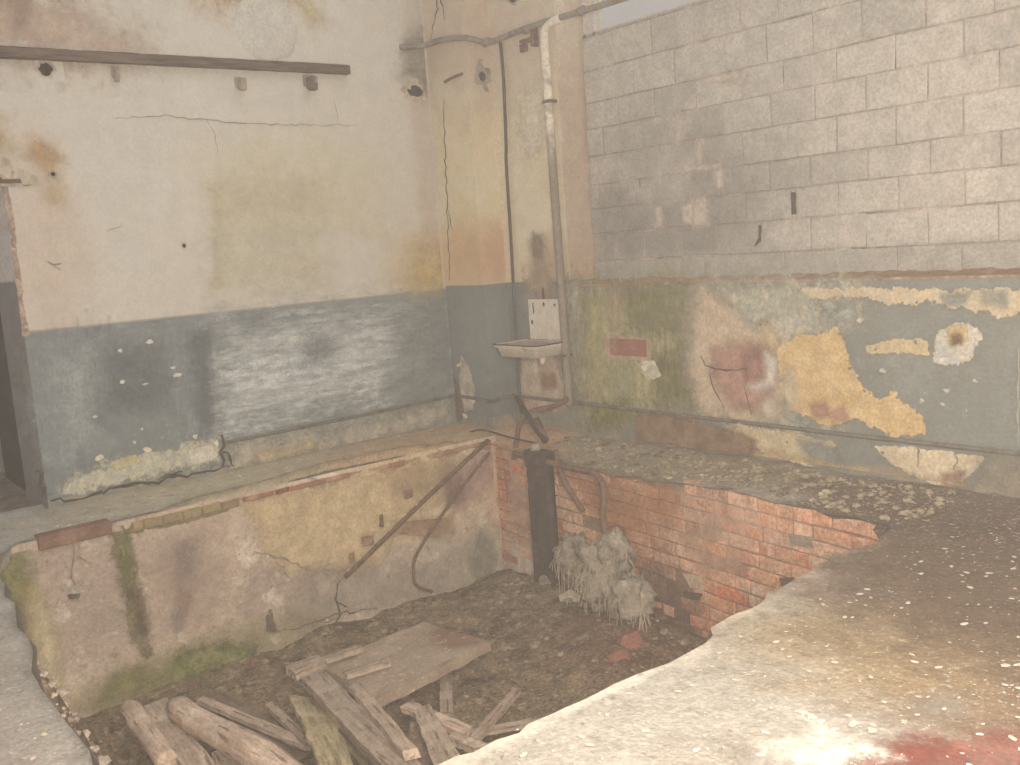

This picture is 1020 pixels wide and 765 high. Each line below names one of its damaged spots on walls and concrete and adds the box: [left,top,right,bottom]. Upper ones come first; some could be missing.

crack [430,0,445,40]
crack [114,102,353,152]
crack [443,107,452,281]
water stain [522,234,553,299]
peeling [57,354,475,496]
water stain [565,277,697,403]
crack [700,356,751,413]
peeling [685,278,1020,488]
crack [255,551,378,630]
spalling [11,436,882,765]
peeling [942,533,1002,625]